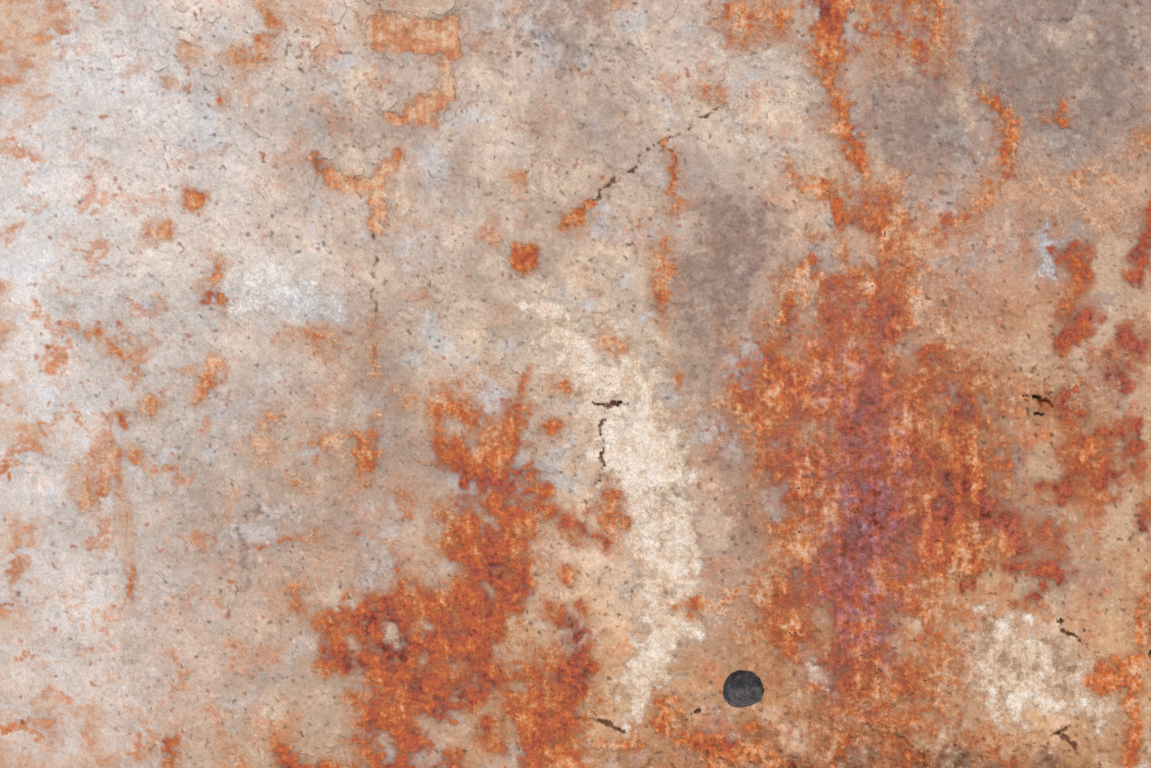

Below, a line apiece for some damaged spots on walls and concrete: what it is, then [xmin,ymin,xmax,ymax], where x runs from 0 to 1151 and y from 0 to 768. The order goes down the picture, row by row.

corrosion [0,0,71,122]
corrosion [481,226,539,273]
corrosion [558,198,598,233]
corrosion [645,236,684,331]
corrosion [659,136,685,214]
corrosion [1021,156,1151,288]
corrosion [672,0,1072,768]
corrosion [1035,239,1148,515]
corrosion [252,364,645,768]
corrosion [1137,500,1151,532]
corrosion [649,692,798,768]
corrosion [1079,574,1151,768]